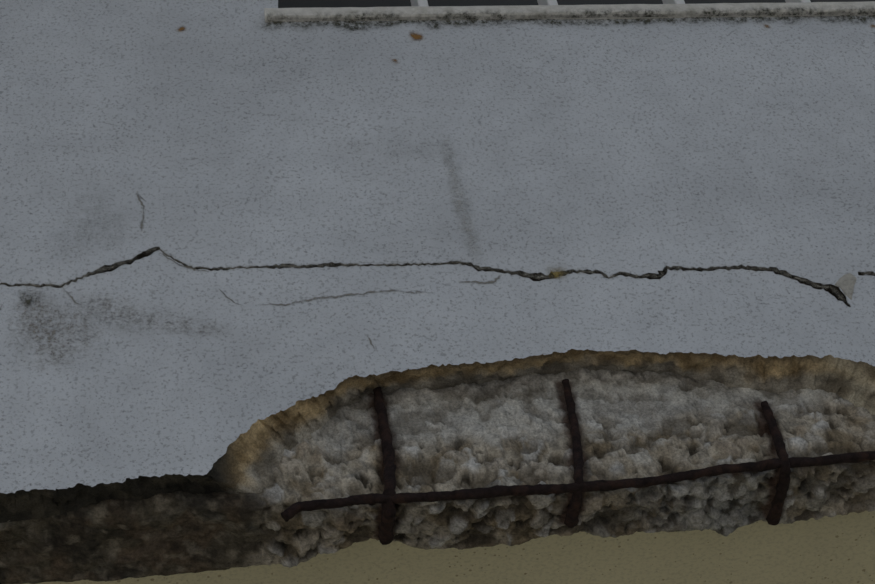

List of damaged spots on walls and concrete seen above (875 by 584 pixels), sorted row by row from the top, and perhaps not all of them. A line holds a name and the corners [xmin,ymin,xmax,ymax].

water stain [266,8,875,30]
crack [0,247,850,307]
crack [858,269,875,277]
spalling [0,349,875,584]